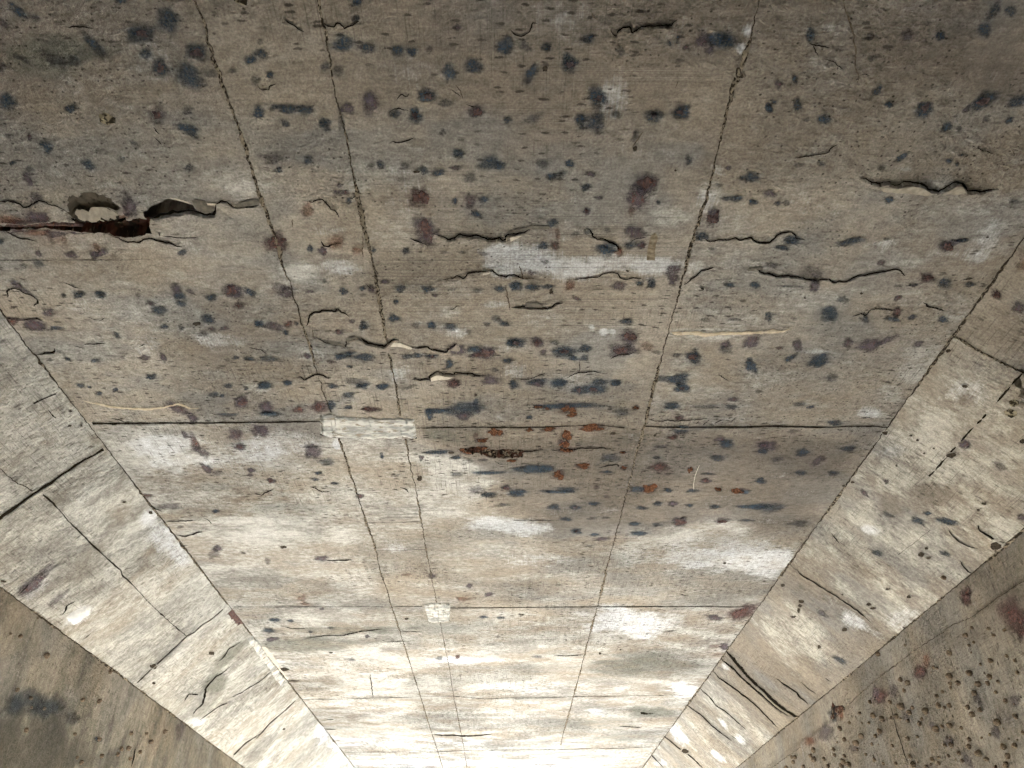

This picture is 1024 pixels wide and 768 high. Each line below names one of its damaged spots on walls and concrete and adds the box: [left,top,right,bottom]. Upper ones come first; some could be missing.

crack [591,11,678,62]
spalling [0,183,215,242]
crack [846,178,999,215]
damp [597,229,637,257]
crack [409,226,645,320]
crack [684,231,905,324]
crack [300,309,487,389]
rust [459,428,503,461]
rust [525,403,604,452]
crack [185,642,296,721]
crack [686,651,831,742]